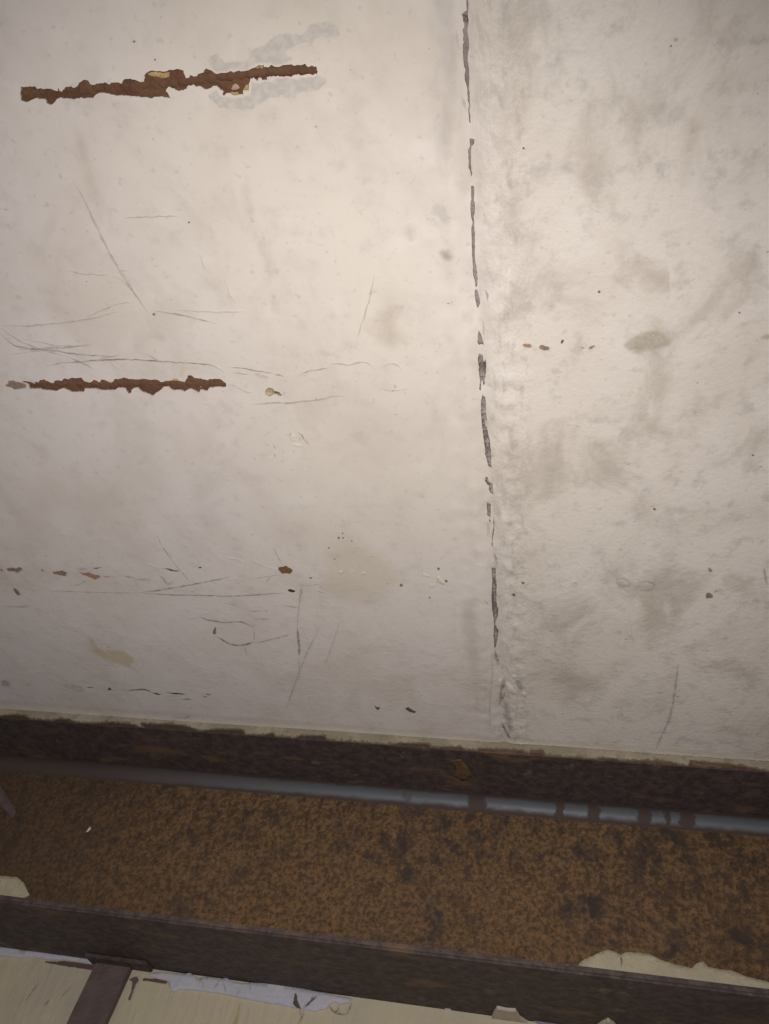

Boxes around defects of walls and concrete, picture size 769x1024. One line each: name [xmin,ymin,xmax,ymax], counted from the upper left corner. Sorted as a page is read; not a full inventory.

damp [619,327,676,355]
crack [454,0,511,740]
corrosion [0,380,28,391]